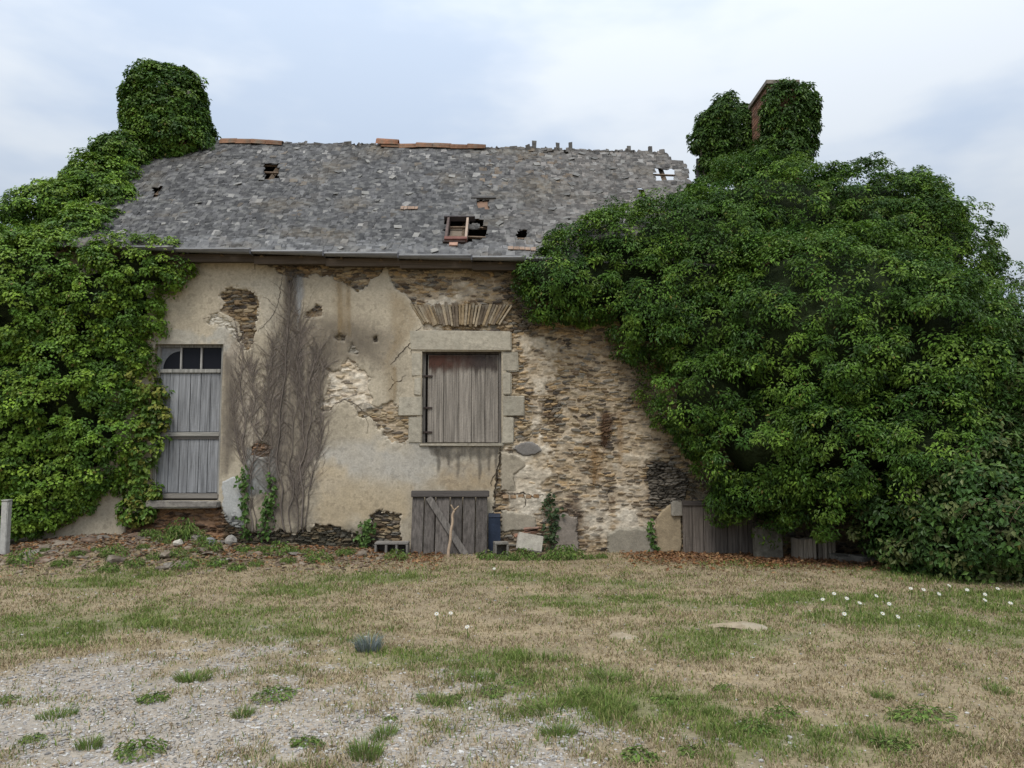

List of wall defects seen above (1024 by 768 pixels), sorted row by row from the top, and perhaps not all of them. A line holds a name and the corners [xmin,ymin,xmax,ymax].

peeling [209,287,262,350]
peeling [319,334,416,445]
spalling [513,527,542,538]